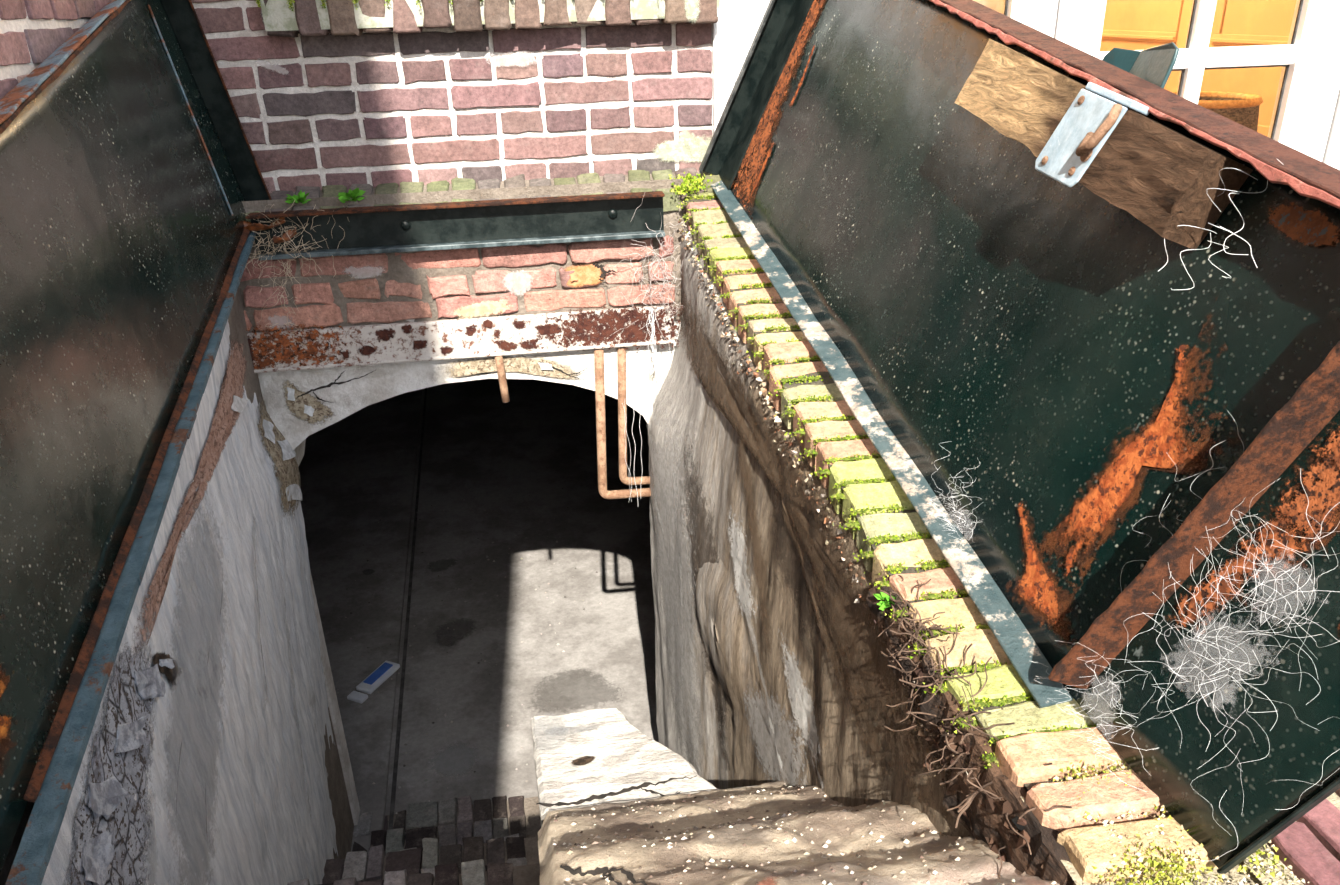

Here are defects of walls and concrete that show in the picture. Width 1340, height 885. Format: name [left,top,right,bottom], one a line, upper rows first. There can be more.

corrosion [731,0,827,219]
corrosion [245,324,453,371]
corrosion [465,302,684,351]
peeling [283,380,334,424]
corrosion [1005,315,1244,648]
corrosion [1167,422,1340,634]
peeling [66,336,302,885]
corrosion [0,646,15,697]
corrosion [0,715,21,776]
crack [536,775,697,807]
crack [560,865,647,885]